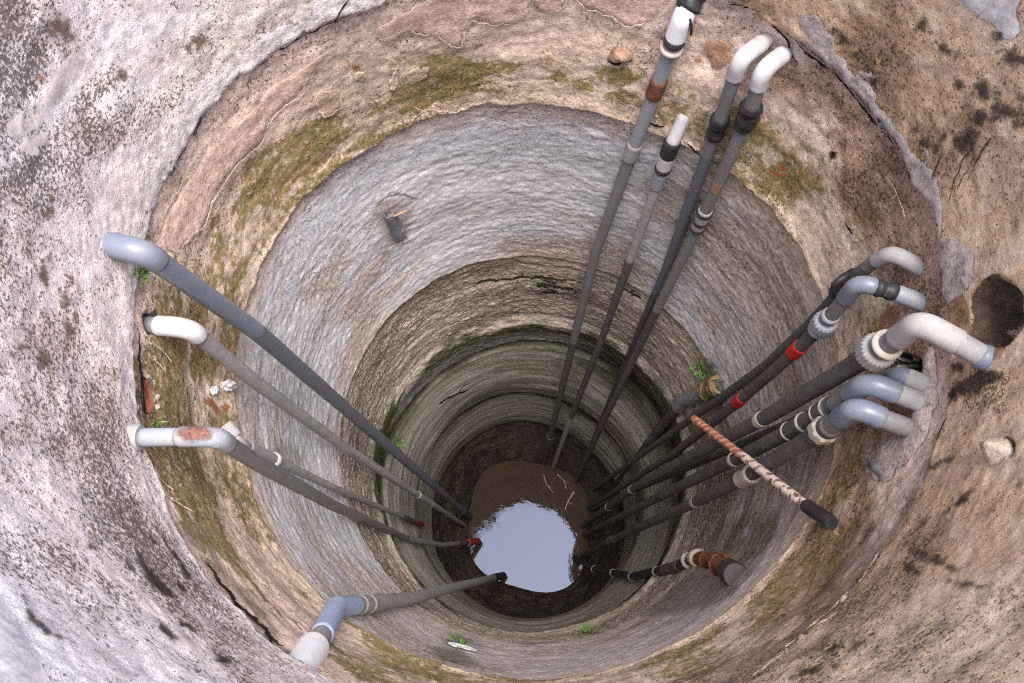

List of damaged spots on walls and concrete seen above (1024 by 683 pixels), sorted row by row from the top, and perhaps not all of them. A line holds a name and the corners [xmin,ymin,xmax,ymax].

crack [259,0,349,66]
crack [722,4,898,148]
crack [470,275,581,285]
spalling [947,273,1024,360]
crack [205,561,283,646]